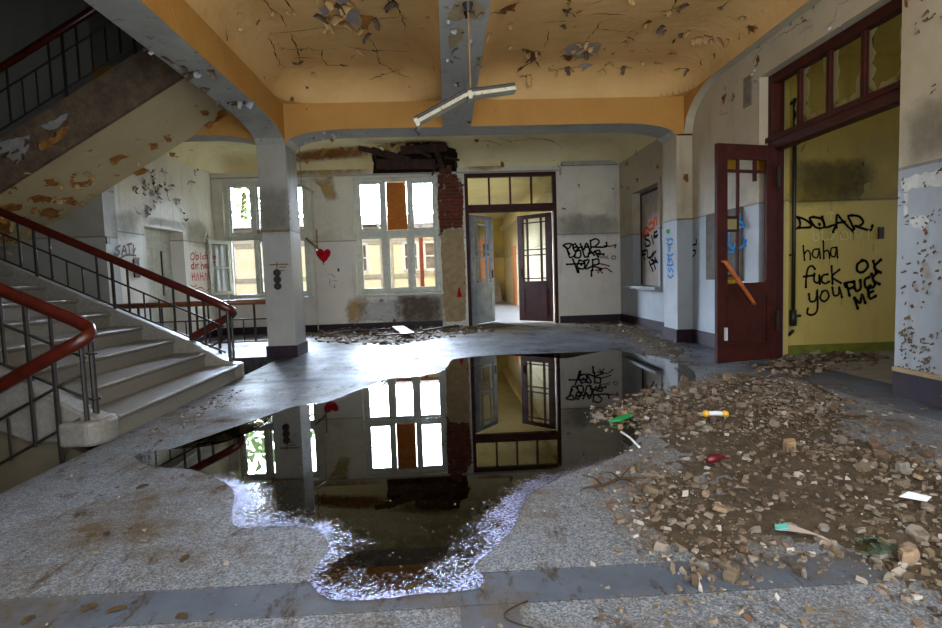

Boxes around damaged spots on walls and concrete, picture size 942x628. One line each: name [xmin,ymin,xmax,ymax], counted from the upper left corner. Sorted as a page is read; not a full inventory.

crack [263,0,430,80]
peeling [313,0,399,44]
peeling [446,0,520,64]
crack [543,0,635,46]
crack [660,0,689,17]
peeling [621,16,758,57]
peeling [507,41,629,88]
peeling [436,165,466,322]
peeling [896,161,942,380]